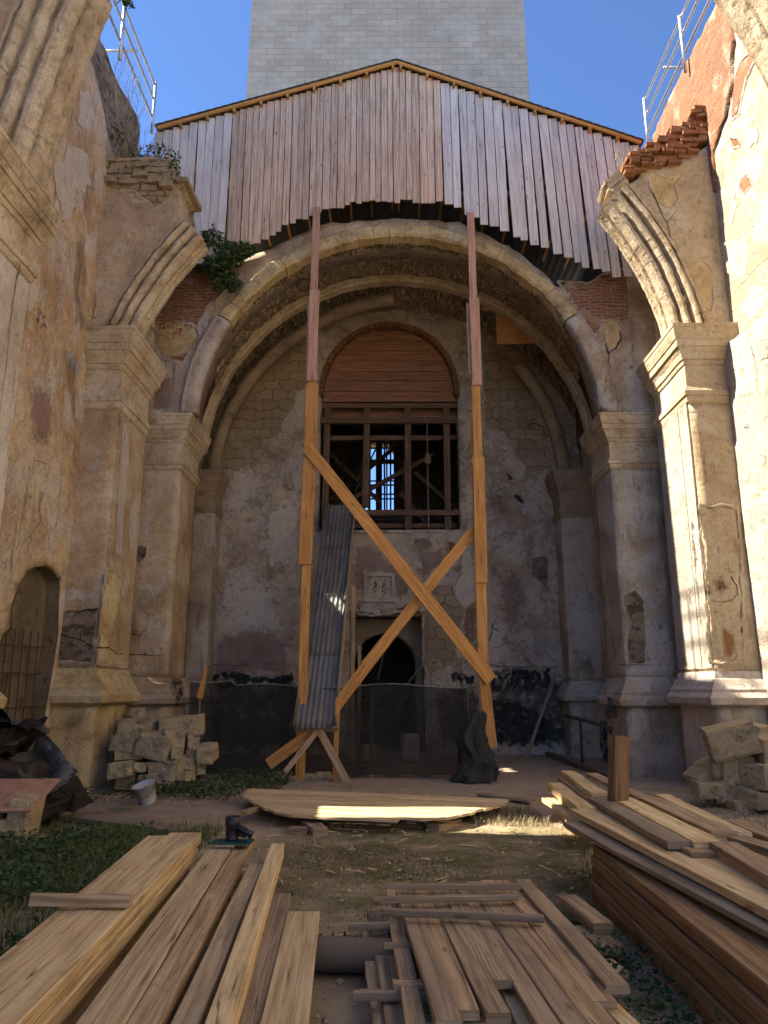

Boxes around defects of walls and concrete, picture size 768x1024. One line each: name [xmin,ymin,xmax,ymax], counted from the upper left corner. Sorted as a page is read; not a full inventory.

flaking render [150,264,242,364]
flaking render [557,267,635,354]
flaking render [58,567,124,666]
spalling [621,588,650,666]